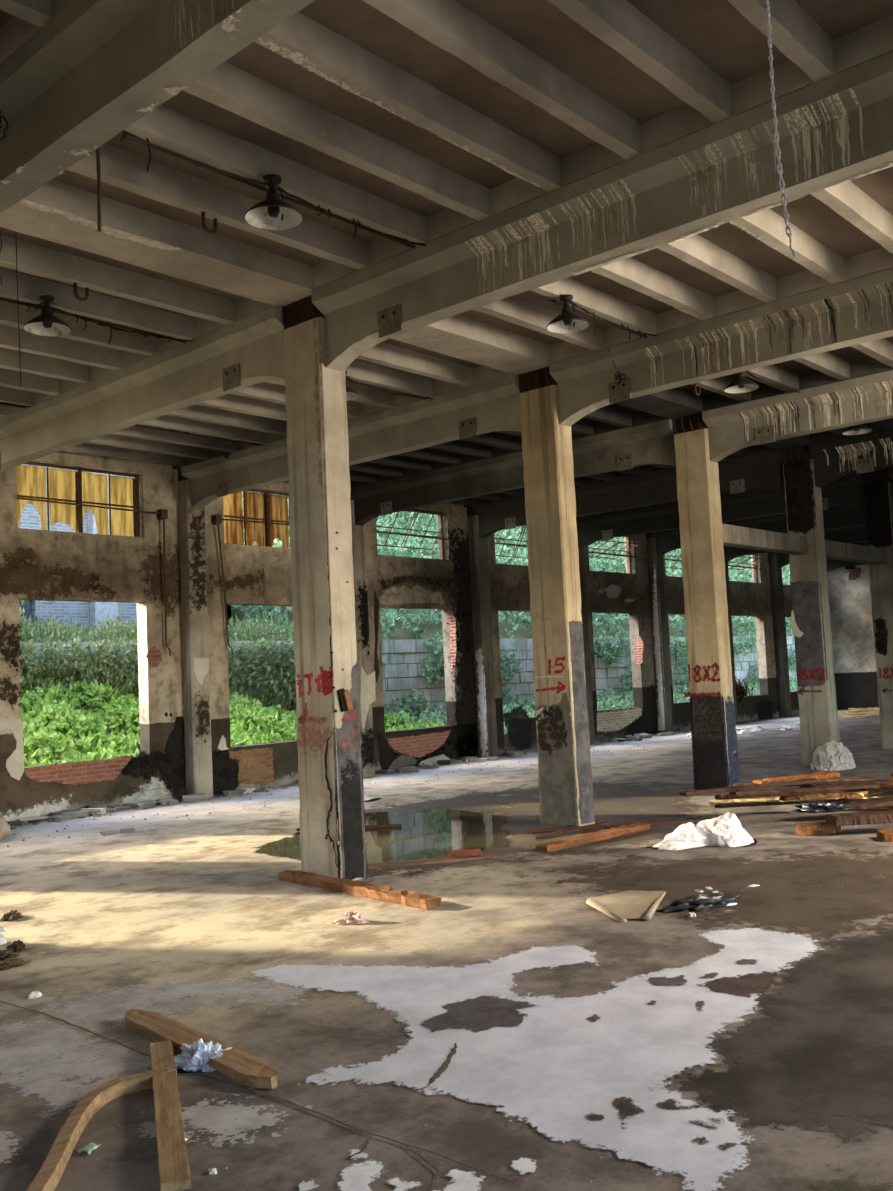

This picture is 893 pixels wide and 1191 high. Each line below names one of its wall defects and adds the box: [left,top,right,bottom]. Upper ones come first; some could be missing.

peeling [220,7,247,40]
efflorescence [783,88,864,183]
efflorescence [465,180,637,293]
efflorescence [676,281,893,379]
damp [738,380,893,441]
damp [0,547,122,604]
damp [0,621,25,710]
peeling [356,585,457,731]
flaking render [0,718,133,785]
flaking render [387,730,451,770]
crack [0,1001,150,1056]
crack [177,1066,514,1189]